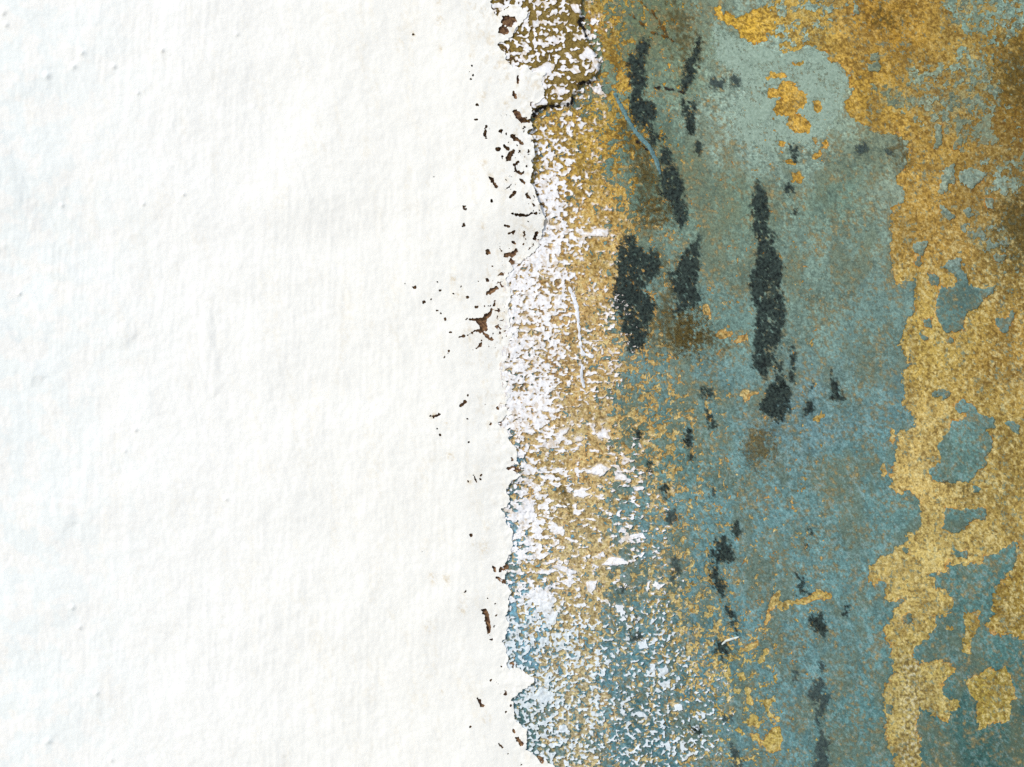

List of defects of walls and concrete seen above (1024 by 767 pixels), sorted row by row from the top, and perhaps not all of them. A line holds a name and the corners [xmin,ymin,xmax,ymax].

peeling [422,0,1024,767]